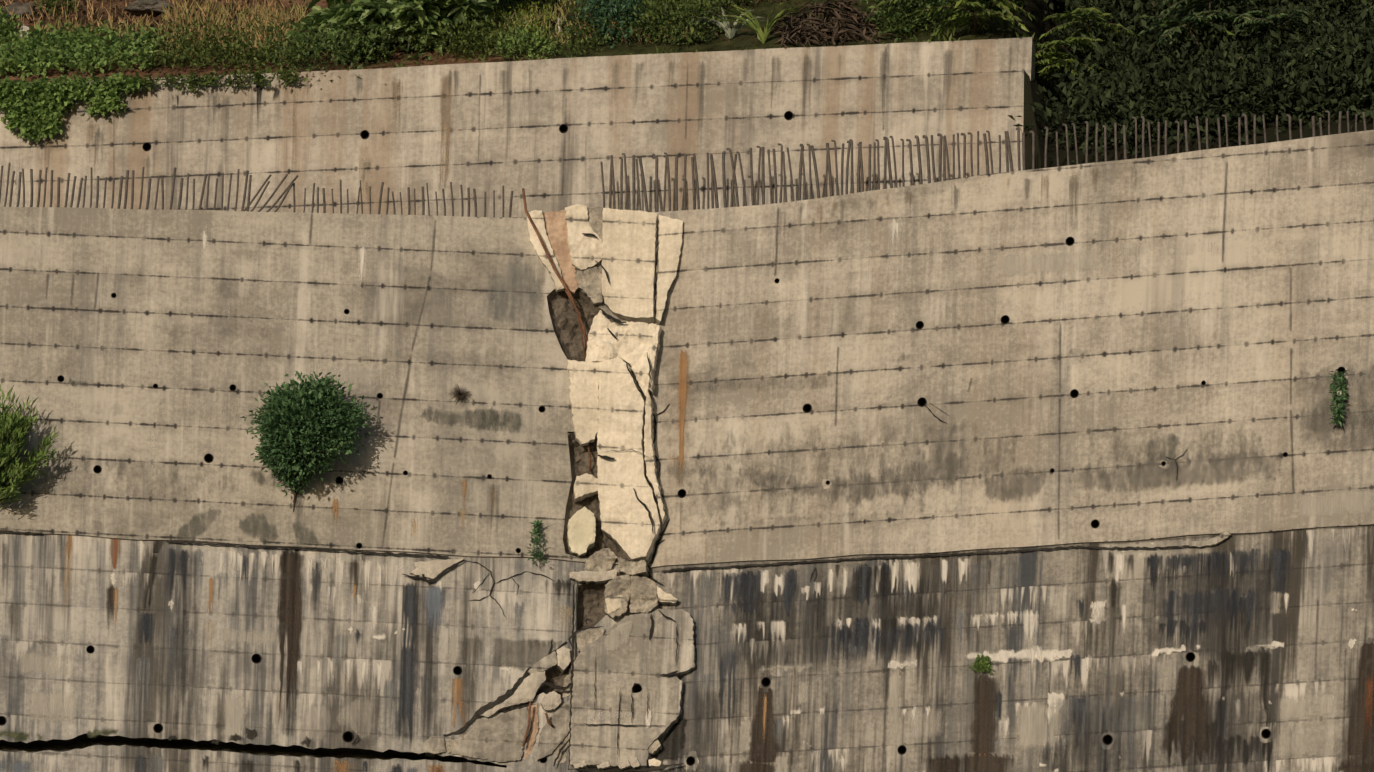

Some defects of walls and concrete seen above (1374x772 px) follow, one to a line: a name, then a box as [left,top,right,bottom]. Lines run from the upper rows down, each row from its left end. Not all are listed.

spalling [1238,110,1374,146]
peeling [0,115,1232,772]
corrosion [679,350,687,469]
leakage [136,511,445,772]
crack [0,540,684,772]
leakage [450,636,555,679]
leakage [555,579,571,618]
leakage [652,559,1089,772]
leakage [999,692,1124,772]
leakage [1079,543,1332,772]
leakage [1338,639,1374,772]